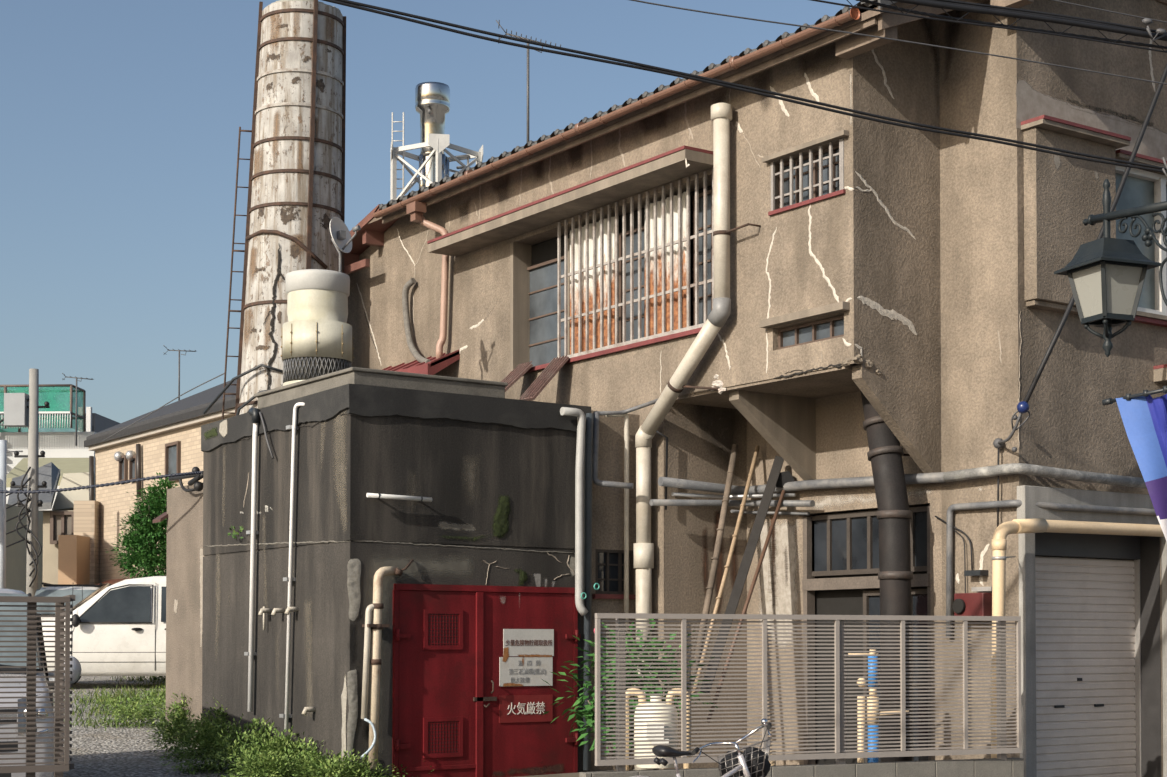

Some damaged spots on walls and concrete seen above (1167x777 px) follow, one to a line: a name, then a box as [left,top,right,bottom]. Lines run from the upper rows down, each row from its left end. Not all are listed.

corrosion [271,14,279,47]
corrosion [254,113,279,183]
crack [844,171,916,240]
crack [263,244,285,390]
crack [718,333,731,370]
crack [766,227,777,373]
crack [842,338,862,356]
crack [808,204,917,335]
spalling [347,559,361,621]
spalling [341,669,358,766]